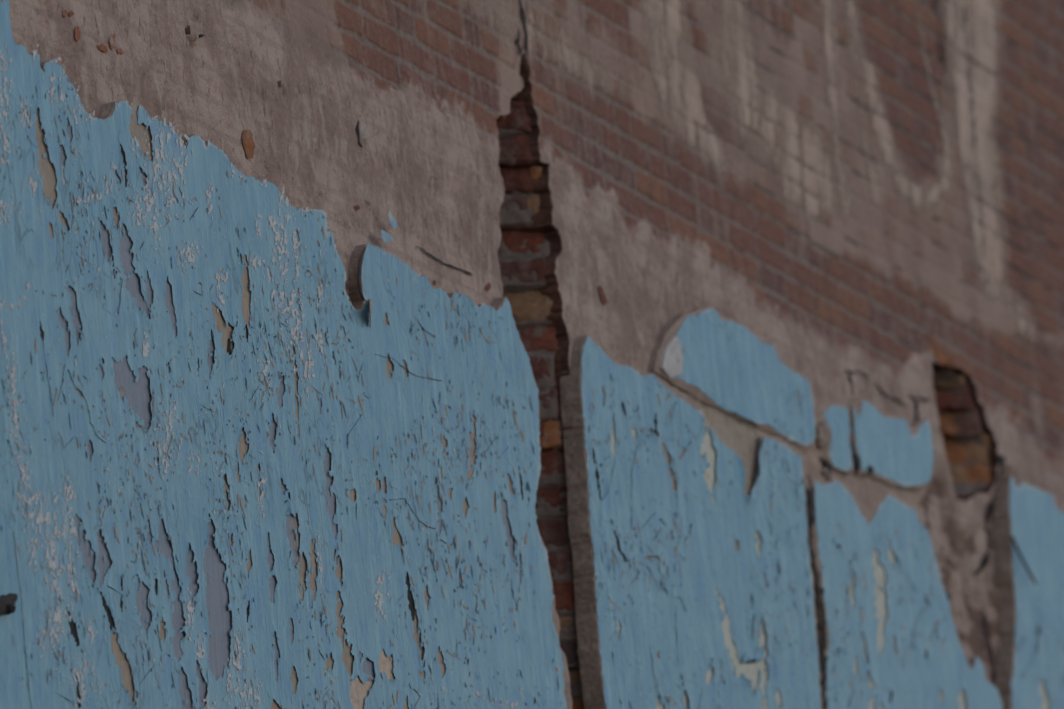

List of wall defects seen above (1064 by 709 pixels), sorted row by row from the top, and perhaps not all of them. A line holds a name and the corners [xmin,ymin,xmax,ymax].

crack [516,0,528,55]
peeling [0,75,535,709]
crack [496,93,585,709]
peeling [598,506,692,665]
peeling [587,375,805,513]
peeling [620,488,810,709]
crack [650,369,930,709]
spalling [932,368,991,496]